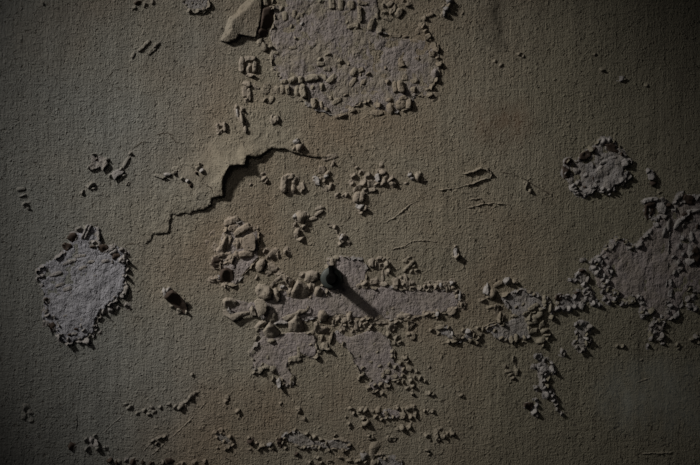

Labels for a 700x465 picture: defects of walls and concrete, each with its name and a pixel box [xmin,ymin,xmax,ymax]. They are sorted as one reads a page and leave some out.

peeling [220,0,454,120]
peeling [87,151,134,187]
peeling [560,136,632,199]
peeling [35,224,132,346]
peeling [428,168,700,419]
peeling [247,317,436,465]